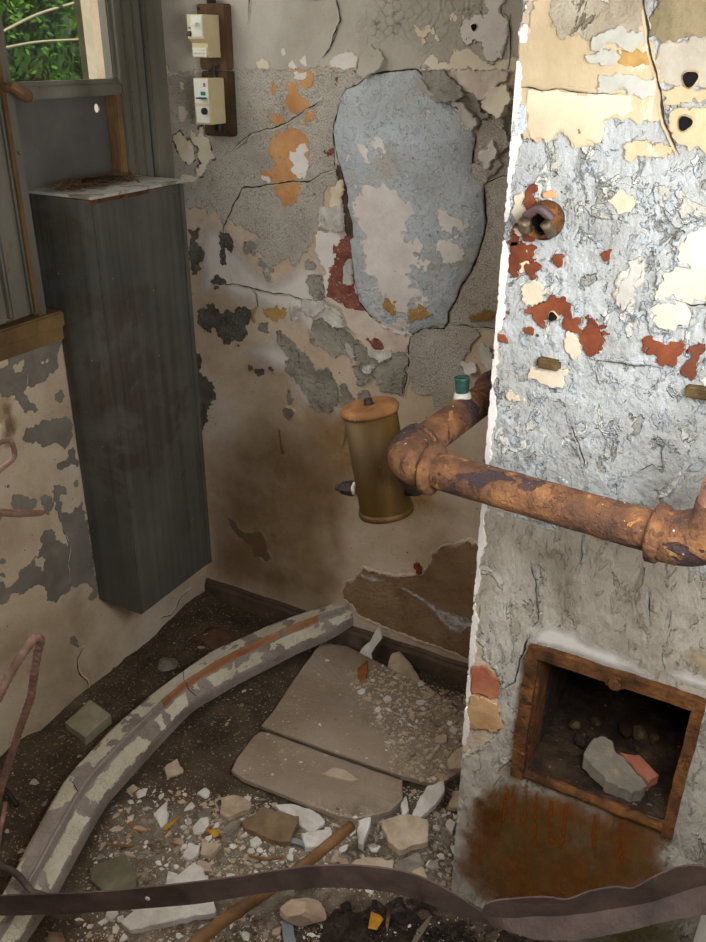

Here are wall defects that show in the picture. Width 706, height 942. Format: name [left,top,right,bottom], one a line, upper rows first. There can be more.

crack [321,0,627,96]
crack [641,0,679,156]
crack [223,99,337,233]
peeling [161,0,706,510]
peeling [0,341,79,470]
peeling [0,480,98,605]
peeling [339,503,706,909]
rust [462,784,659,898]
peeling [638,915,701,942]